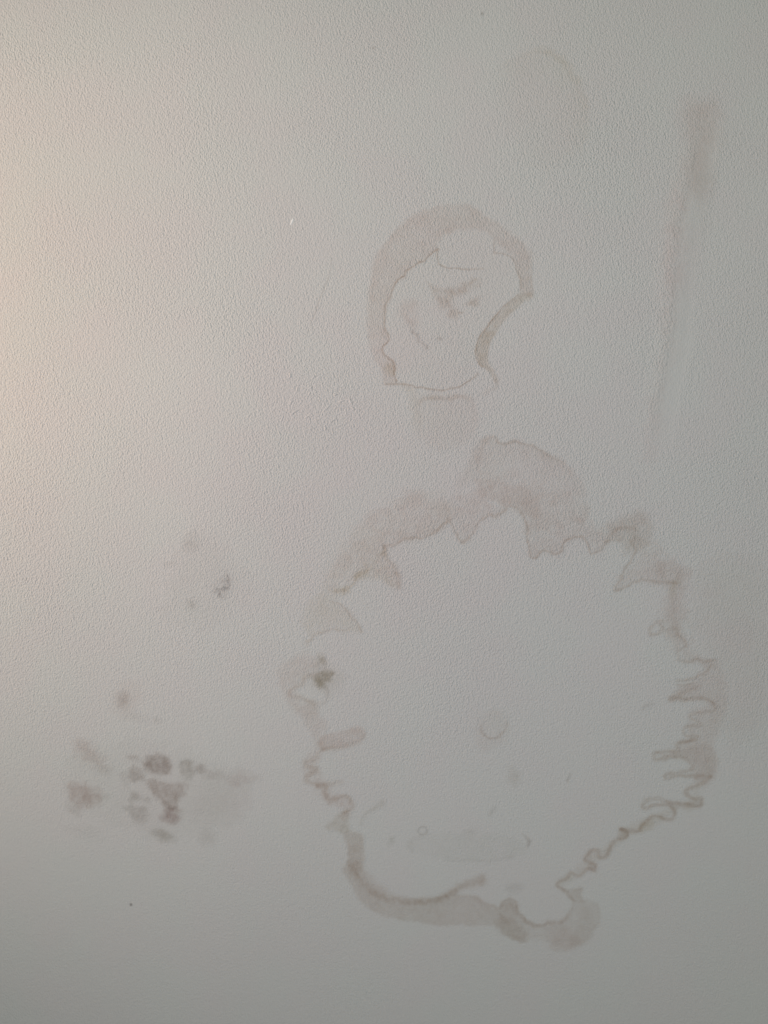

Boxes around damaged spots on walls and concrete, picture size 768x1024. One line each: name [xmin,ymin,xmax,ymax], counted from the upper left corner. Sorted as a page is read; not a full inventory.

leakage [57,736,263,848]
leakage [273,202,768,954]